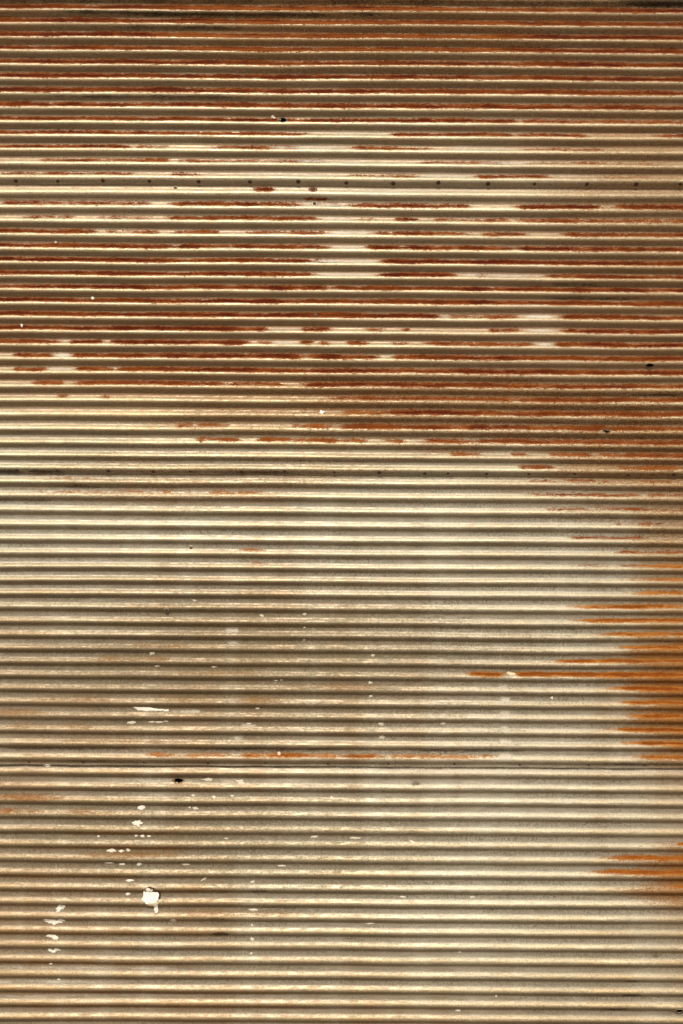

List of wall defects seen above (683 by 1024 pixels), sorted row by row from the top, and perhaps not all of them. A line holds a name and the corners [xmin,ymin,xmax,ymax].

corrosion [0,2,683,179]
corrosion [0,186,683,763]
corrosion [589,842,683,909]